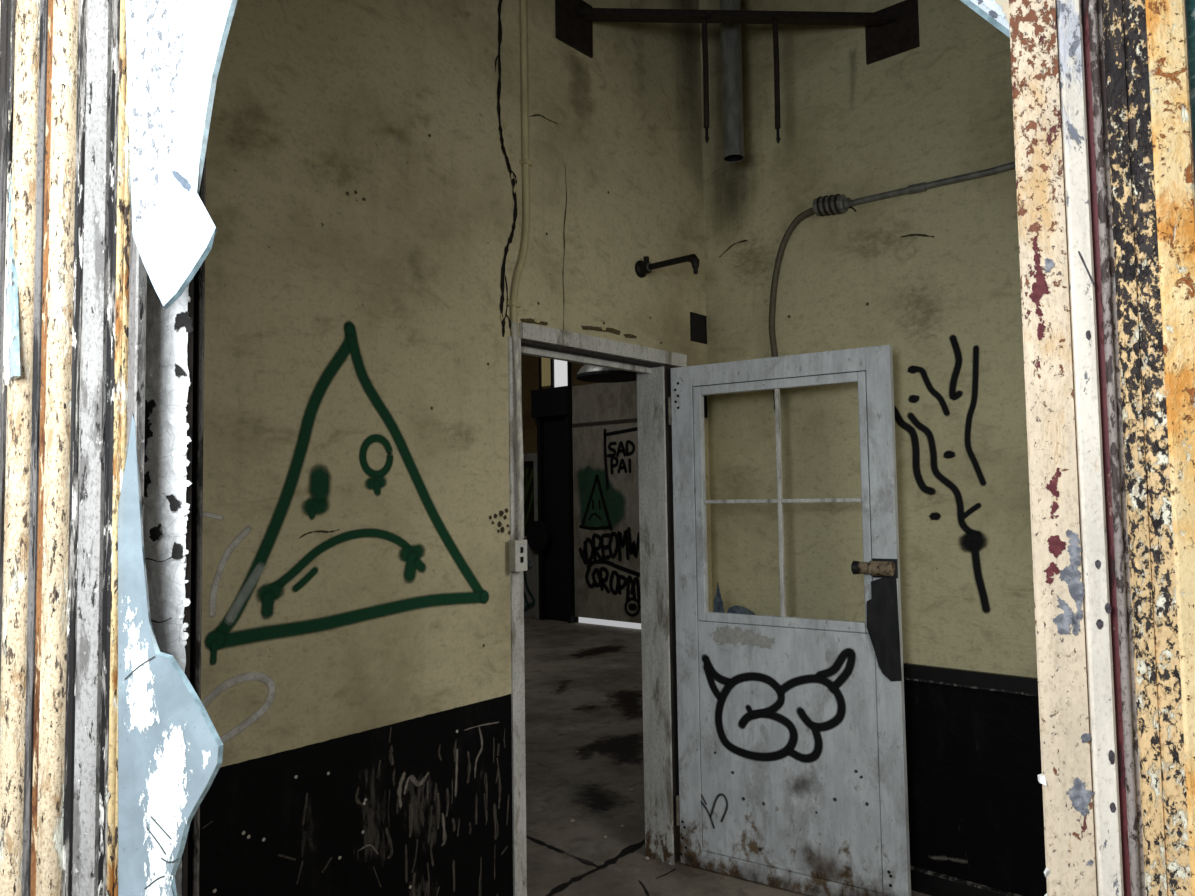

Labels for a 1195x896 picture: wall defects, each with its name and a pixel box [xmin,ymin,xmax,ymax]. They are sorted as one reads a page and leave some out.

crack [495,0,558,337]
spalling [8,175,20,381]
peeling [1029,236,1056,341]
peeling [1046,468,1061,519]
peeling [1044,529,1111,636]
peeling [1066,777,1095,816]